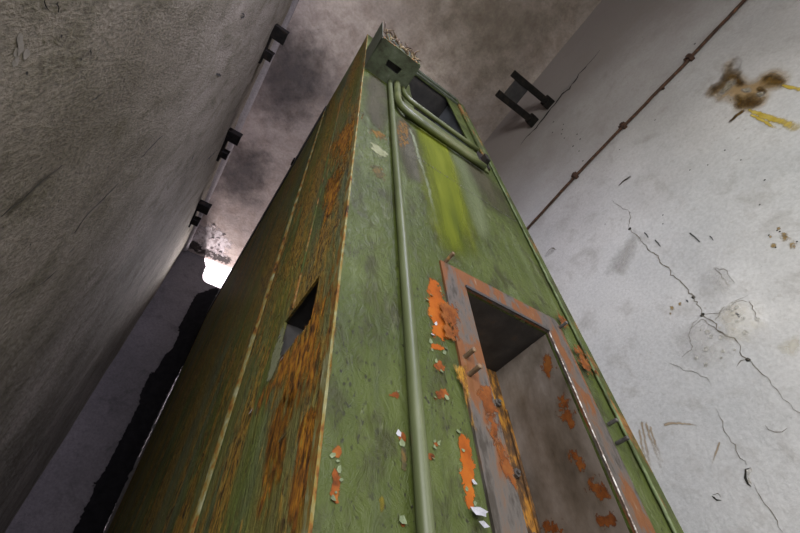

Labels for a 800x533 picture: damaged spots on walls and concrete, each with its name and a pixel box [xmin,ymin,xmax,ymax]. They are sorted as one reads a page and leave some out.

rust [711,65,800,129]
crack [618,205,800,413]